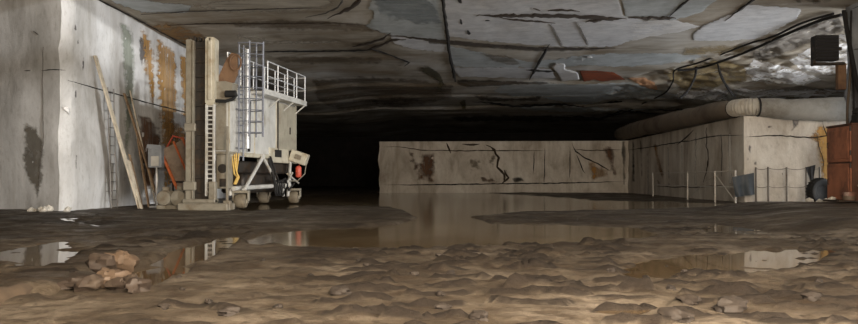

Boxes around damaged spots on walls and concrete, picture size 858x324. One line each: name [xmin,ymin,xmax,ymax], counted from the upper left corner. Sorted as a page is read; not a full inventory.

crack [25,69,186,191]
rust [140,31,186,187]
crack [99,0,689,82]
water stain [410,153,434,181]
crack [476,101,683,120]
spalling [365,0,848,112]
crack [402,126,827,188]
rust [580,71,658,90]
crack [725,0,755,21]
rust [811,127,828,179]